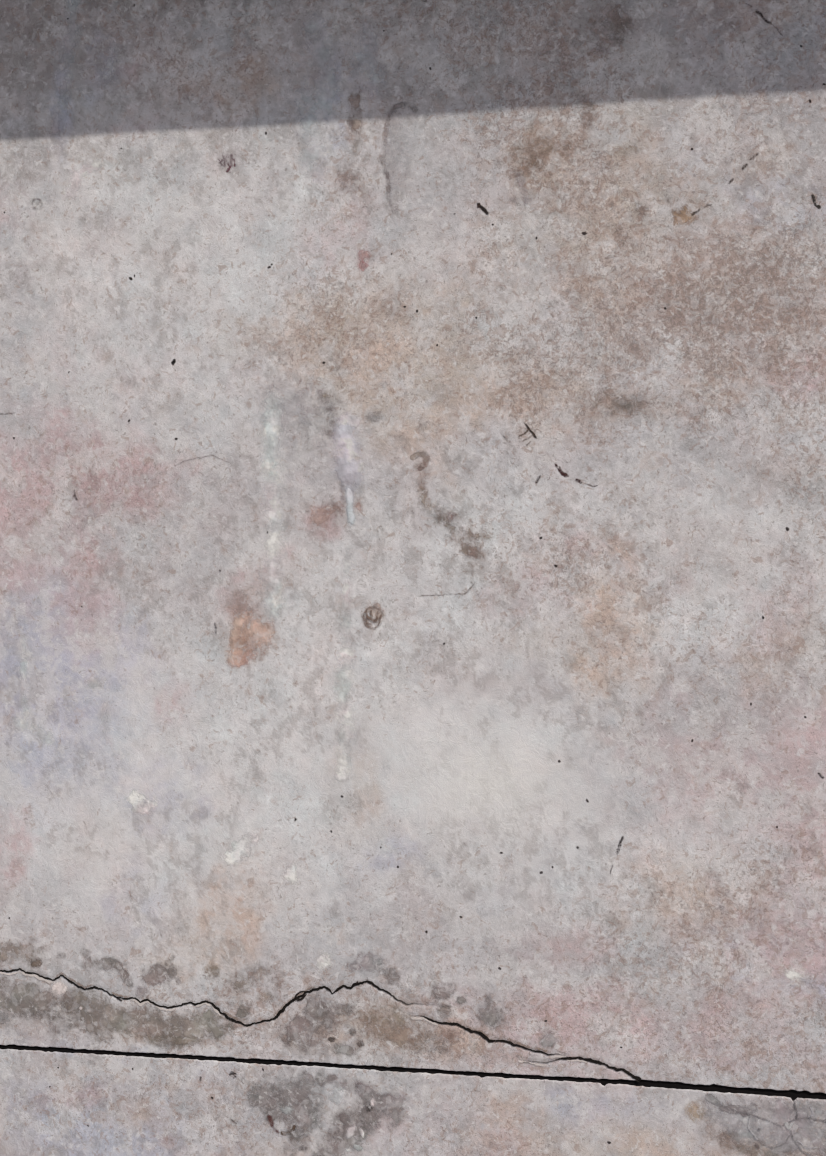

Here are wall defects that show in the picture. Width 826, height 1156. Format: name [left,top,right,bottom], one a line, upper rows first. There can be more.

crack [0,968,641,1083]